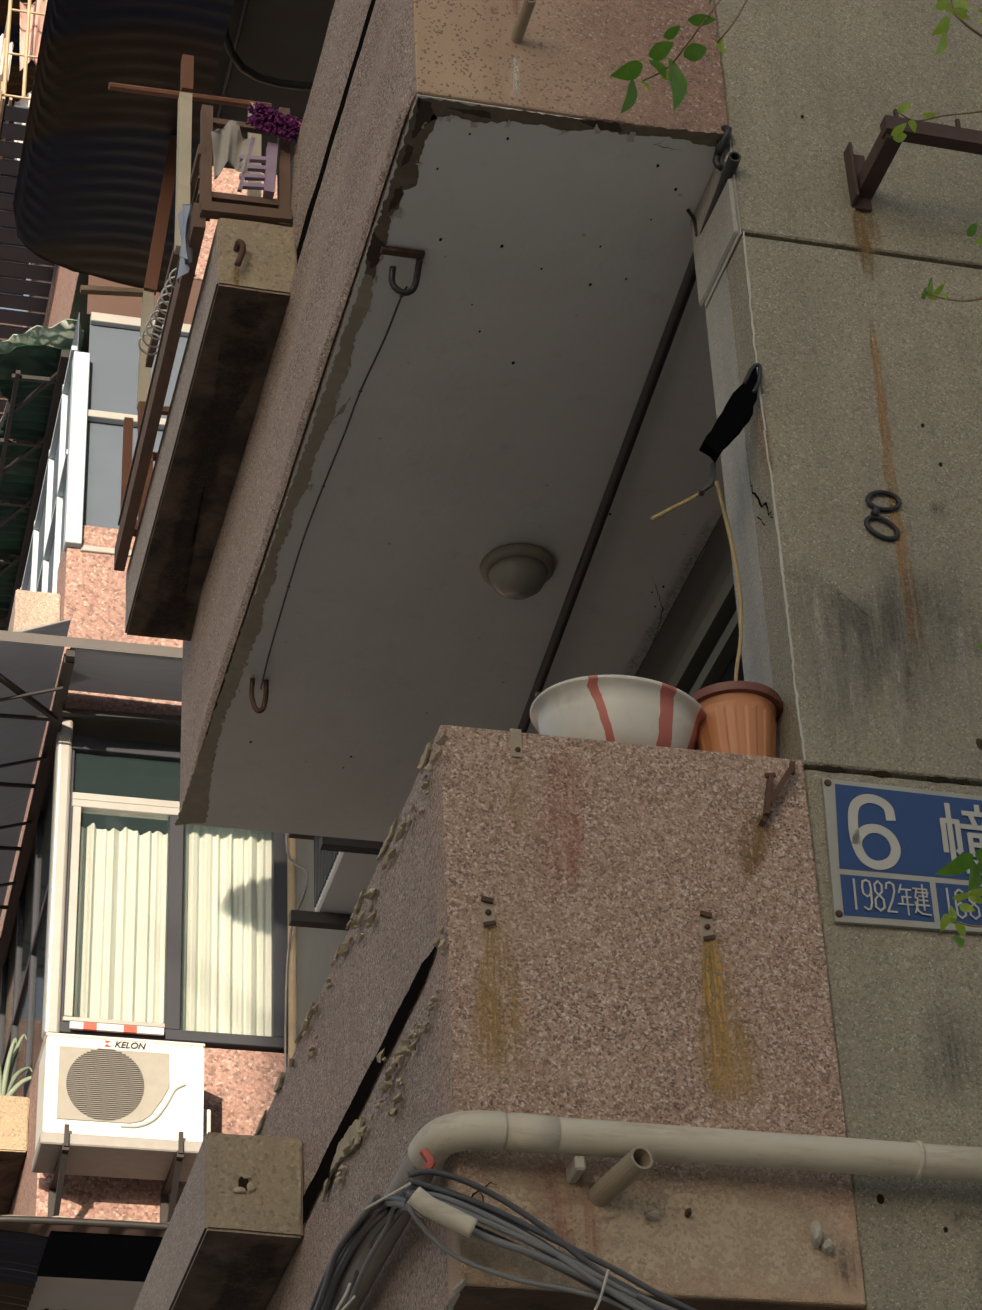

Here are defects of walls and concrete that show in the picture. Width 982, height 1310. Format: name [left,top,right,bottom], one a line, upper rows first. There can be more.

peeling [175,97,723,825]
flaking render [377,734,448,870]
flaking render [325,888,377,990]
flaking render [273,1002,318,1092]
crack [303,947,437,1225]
flaking render [322,987,441,1202]